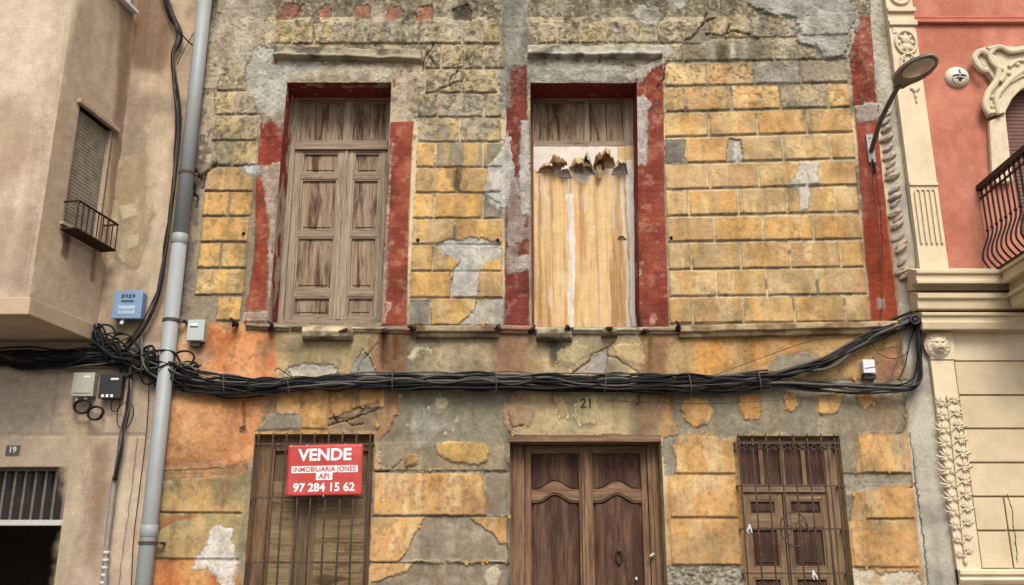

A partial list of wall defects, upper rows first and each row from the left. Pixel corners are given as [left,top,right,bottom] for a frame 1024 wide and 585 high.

flaking render [214,0,393,128]
crack [422,45,463,92]
crack [685,15,750,41]
flaking render [845,10,861,62]
flaking render [436,120,531,326]
flaking render [284,349,376,377]
flaking render [555,339,645,376]
flaking render [666,344,909,521]
flaking render [329,390,535,585]
flaking render [189,525,239,585]